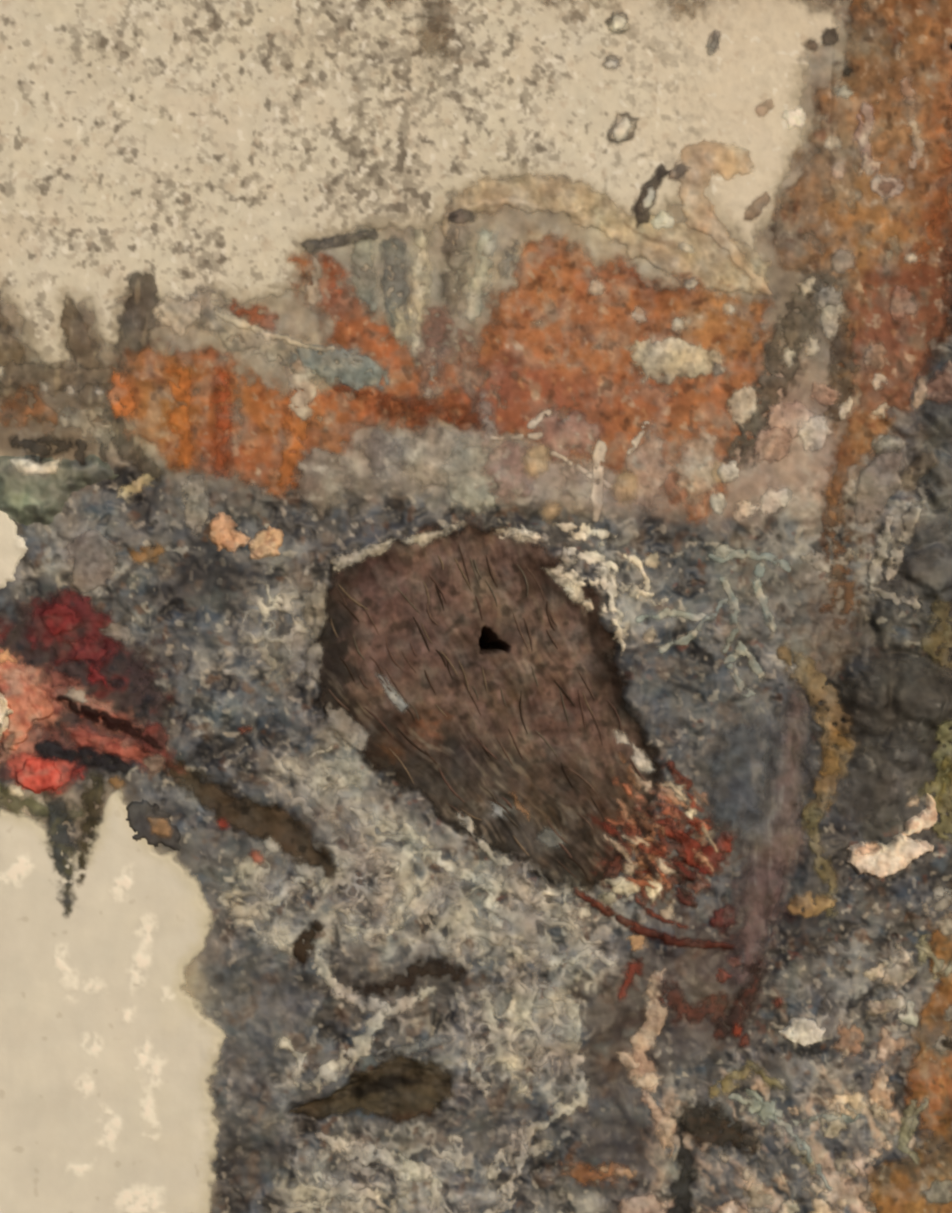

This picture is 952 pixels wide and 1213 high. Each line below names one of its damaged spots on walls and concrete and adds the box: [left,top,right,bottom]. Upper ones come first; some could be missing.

peeling [607,12,629,33]
peeling [607,113,639,143]
peeling [707,31,721,55]
peeling [756,100,774,116]
peeling [154,296,201,336]
rust [108,234,771,522]
peeling [301,140,771,454]
spalling [710,270,887,520]
rust [771,0,952,523]
rust [126,799,182,851]
spalling [302,511,738,908]
rust [869,886,952,1213]